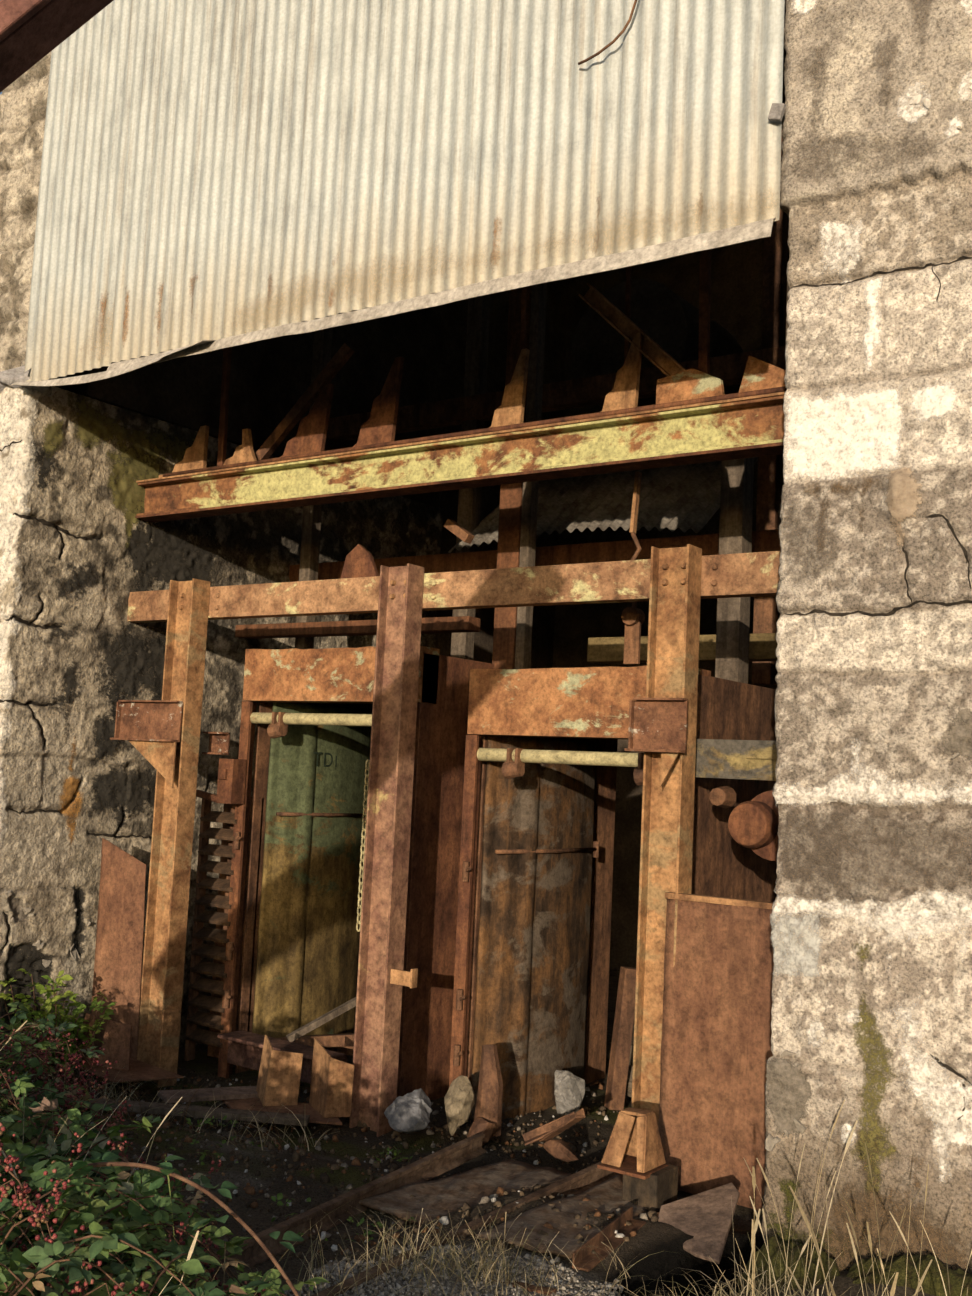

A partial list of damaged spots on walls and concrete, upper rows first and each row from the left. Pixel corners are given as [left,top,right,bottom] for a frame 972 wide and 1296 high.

leakage [30,440,61,492]
crack [13,512,101,559]
leakage [122,510,221,592]
crack [785,514,972,616]
crack [5,596,62,629]
leakage [49,557,166,835]
crack [0,700,53,749]
crack [10,780,81,814]
crack [88,812,152,839]
leakage [896,1007,972,1179]
leakage [811,1129,971,1273]